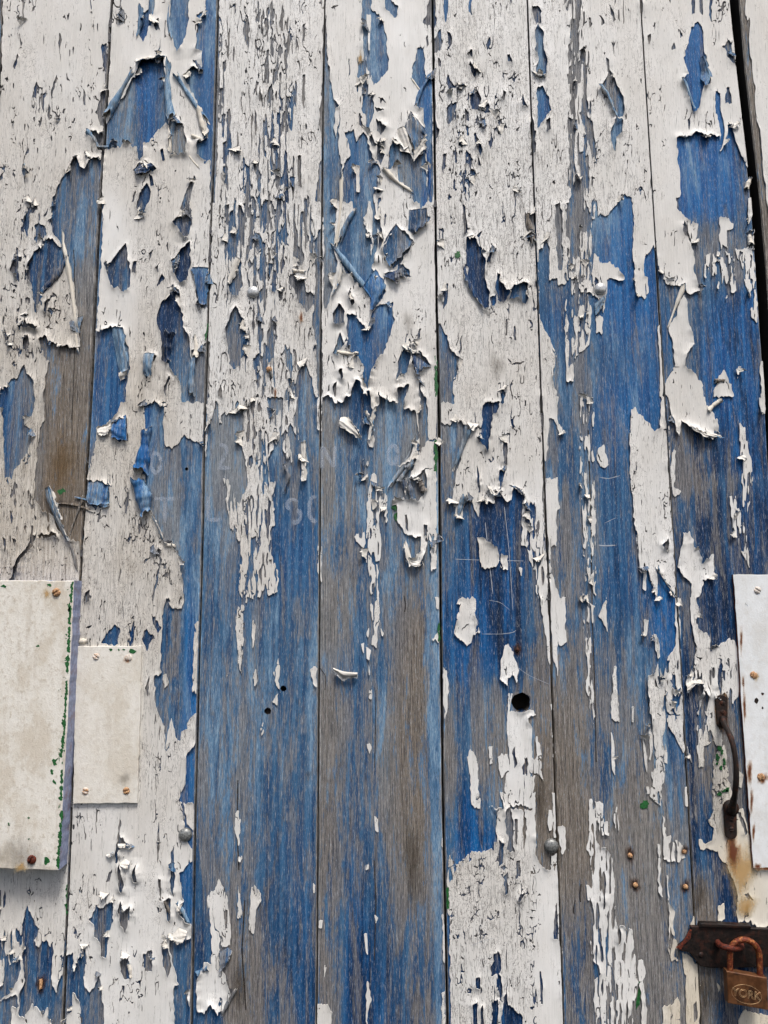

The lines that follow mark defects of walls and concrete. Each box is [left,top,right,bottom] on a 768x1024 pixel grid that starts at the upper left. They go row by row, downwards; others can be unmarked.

peeling [33,83,46,112]
peeling [85,0,232,220]
peeling [0,150,136,580]
peeling [130,0,556,1024]
peeling [538,0,768,1024]
peeling [0,820,136,1024]
rust [728,838,768,913]